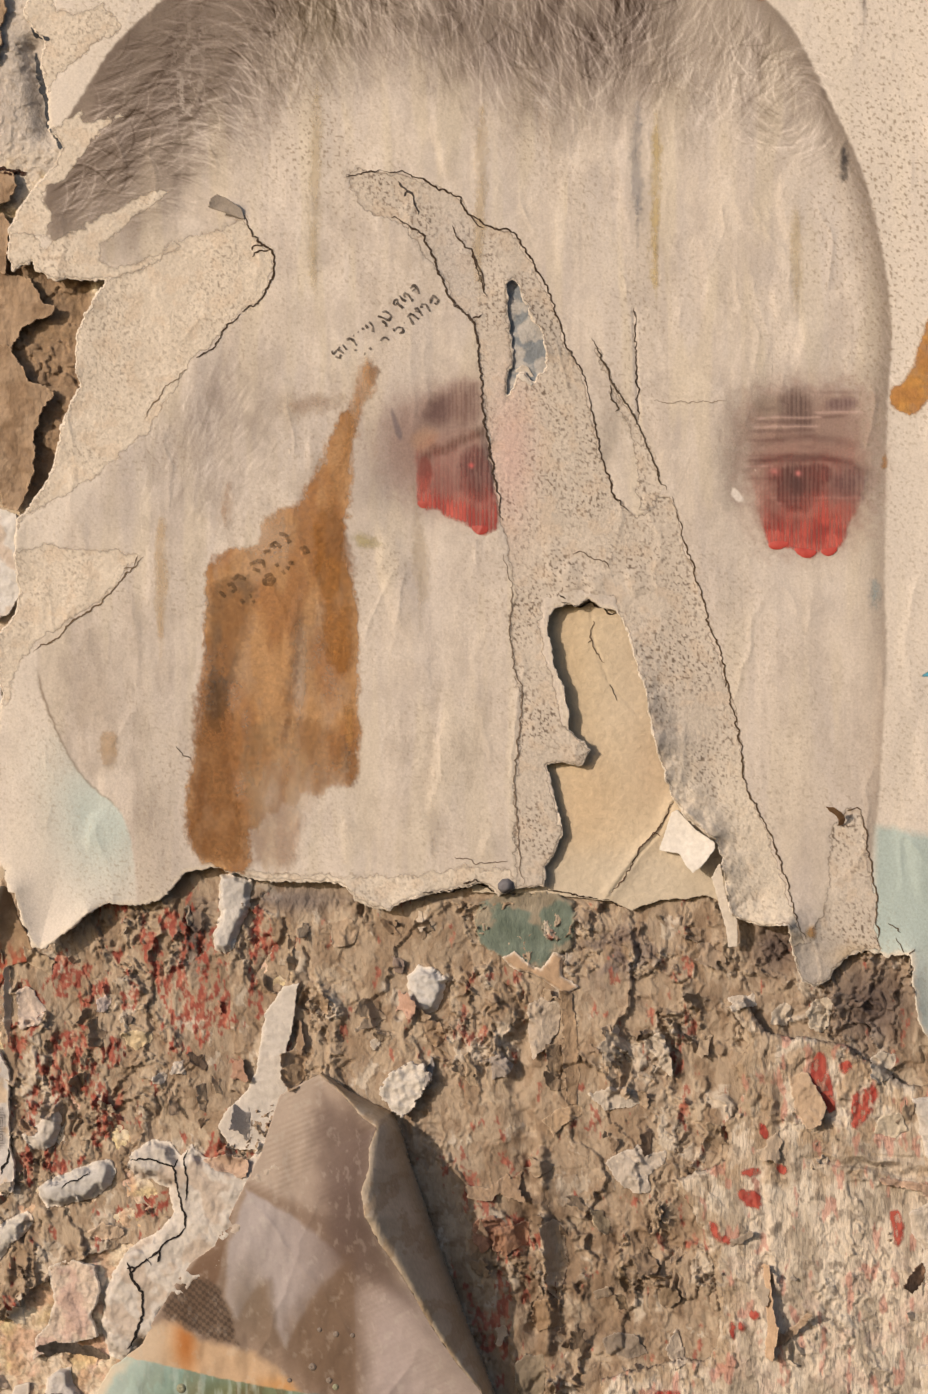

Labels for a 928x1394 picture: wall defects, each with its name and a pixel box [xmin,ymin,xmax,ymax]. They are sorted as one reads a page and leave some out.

peeling [0,0,121,91]
crack [145,215,276,418]
peeling [0,543,131,705]
peeling [233,168,881,1032]
crack [347,170,806,937]
peeling [76,995,153,1050]
peeling [151,1052,252,1179]
peeling [280,1020,308,1092]
peeling [526,988,673,1138]
peeling [789,1072,827,1129]
peeling [465,1128,686,1371]
peeling [756,1263,813,1367]